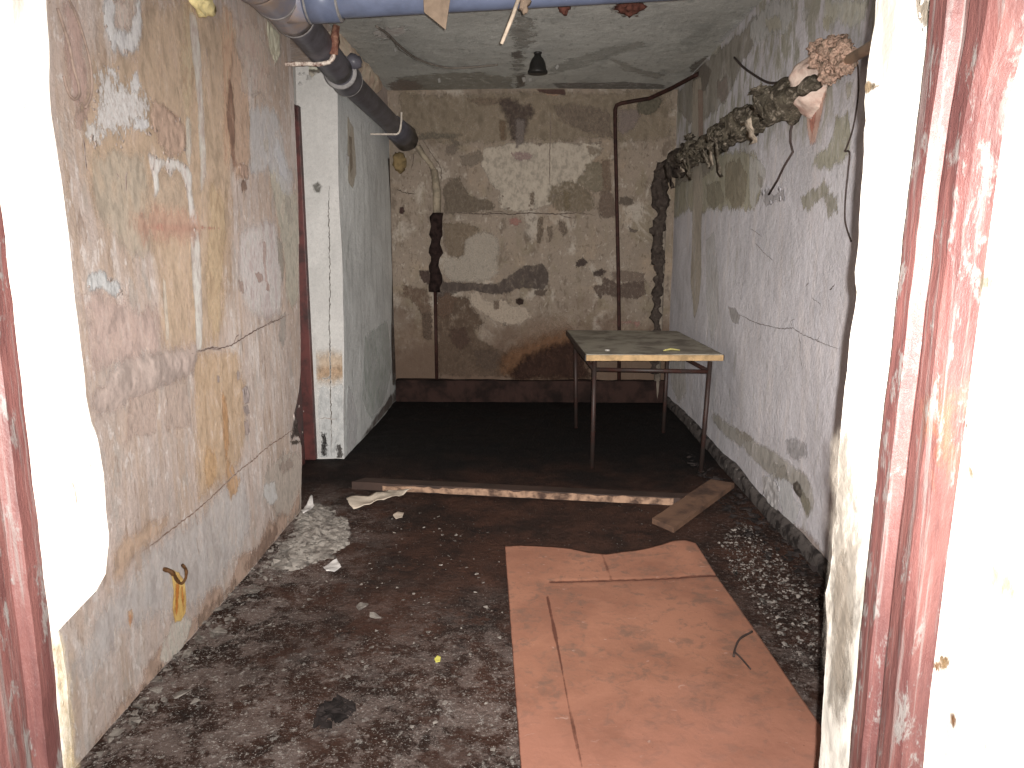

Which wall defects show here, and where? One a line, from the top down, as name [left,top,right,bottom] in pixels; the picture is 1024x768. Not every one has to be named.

peeling [85,0,198,232]
leakage [386,0,808,167]
leakage [800,82,852,219]
peeling [87,270,123,297]
crack [192,314,289,354]
crack [320,187,337,456]
leakage [363,264,549,436]
leakage [674,151,766,339]
crack [740,229,839,370]
crack [142,430,292,554]
leakage [713,414,813,512]
corrosion [172,571,186,622]